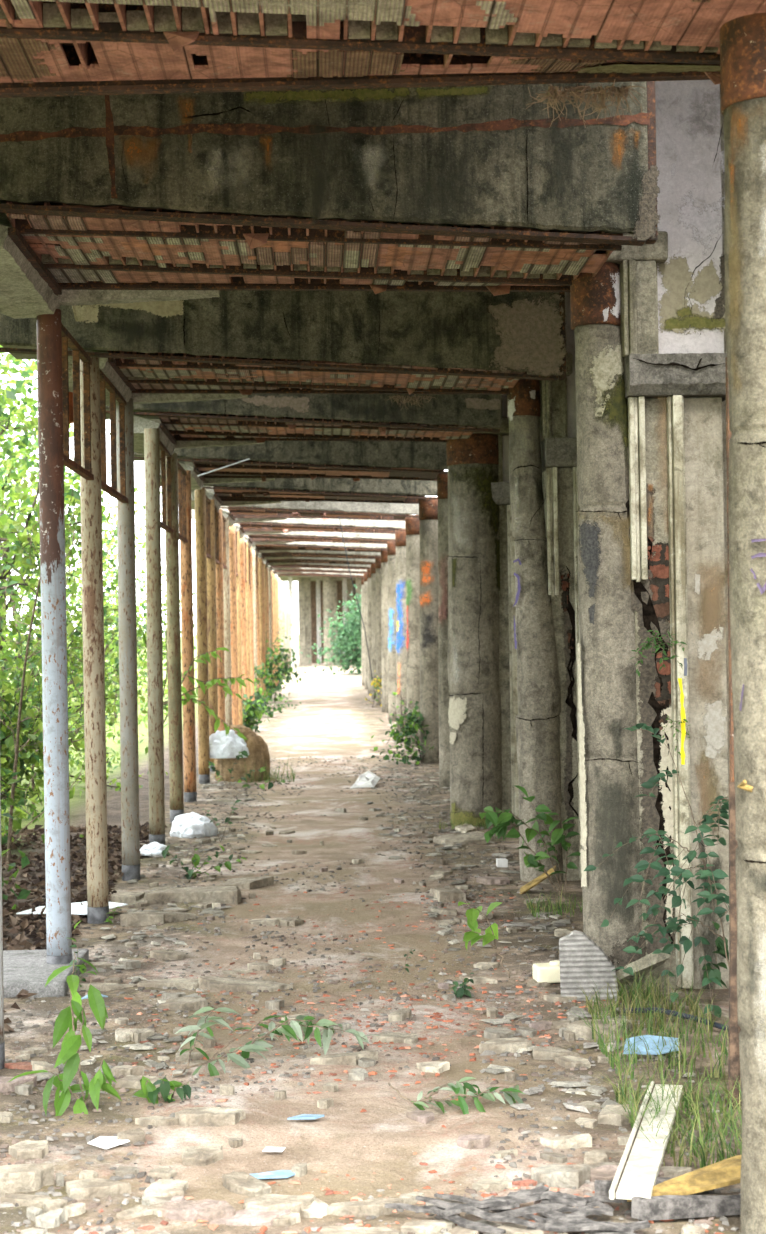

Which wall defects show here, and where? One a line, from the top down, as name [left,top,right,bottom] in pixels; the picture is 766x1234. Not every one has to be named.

damp [545,106,573,208]
peeling [488,293,568,377]
crack [634,358,725,371]
peeling [657,254,725,334]
crack [739,440,766,448]
peeling [448,696,468,744]
crack [449,556,484,812]
crack [511,446,675,954]